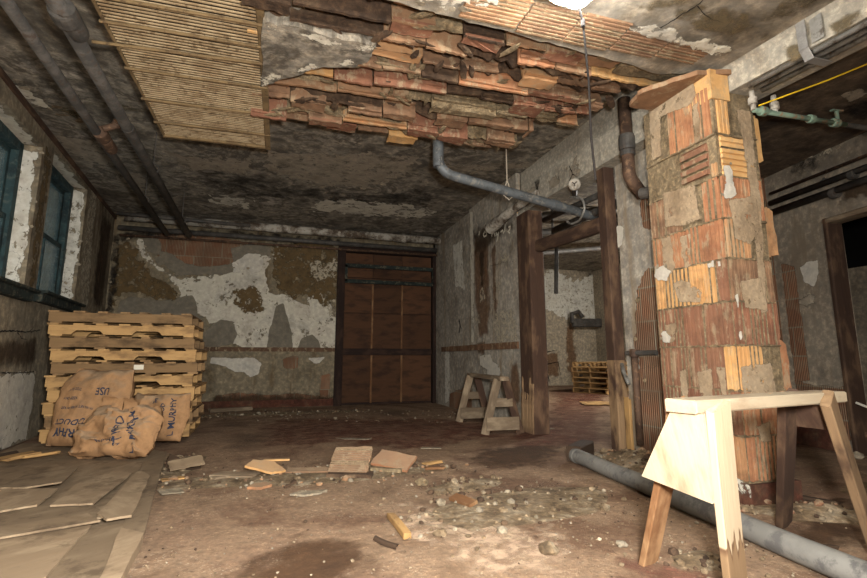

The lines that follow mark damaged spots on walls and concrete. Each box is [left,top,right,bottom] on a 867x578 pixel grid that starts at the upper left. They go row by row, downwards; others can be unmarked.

flaking render [416,0,499,12]
flaking render [629,24,732,56]
leakage [54,135,160,194]
leakage [164,151,339,201]
spalling [640,199,651,230]
peeling [108,233,338,377]
spalling [633,264,667,452]